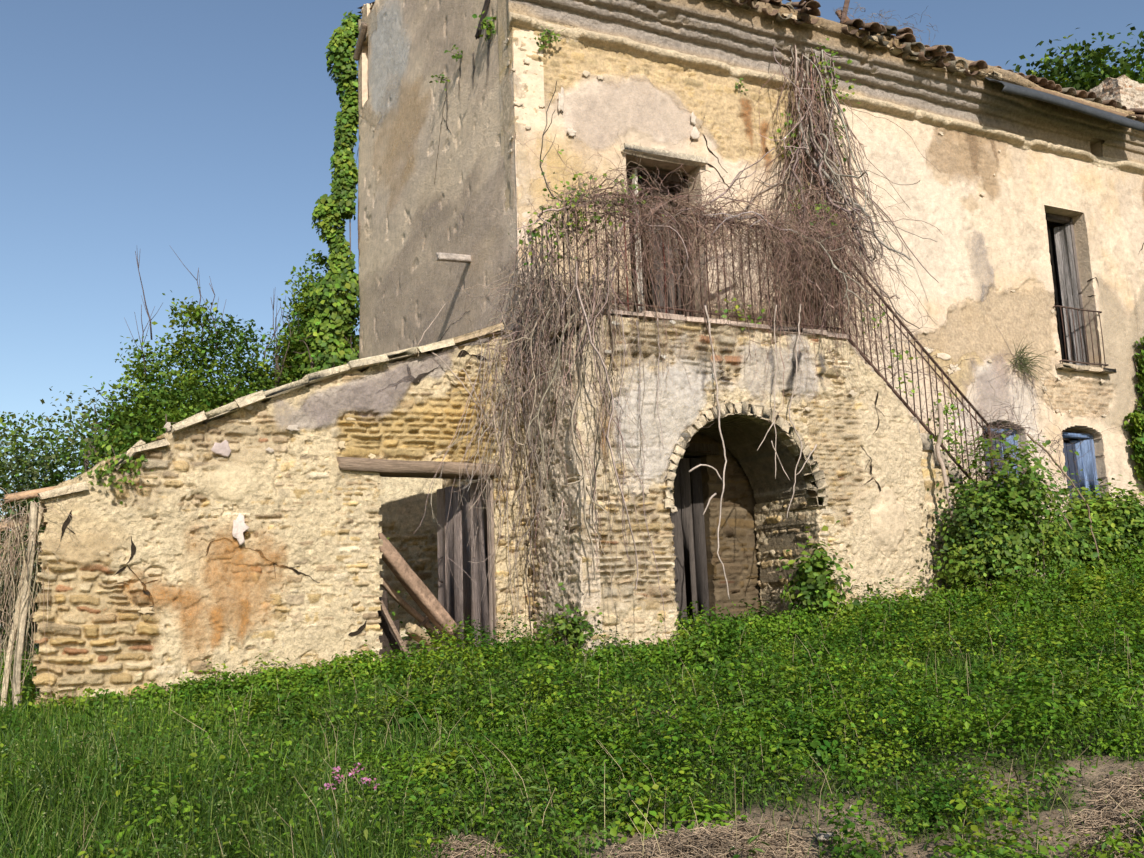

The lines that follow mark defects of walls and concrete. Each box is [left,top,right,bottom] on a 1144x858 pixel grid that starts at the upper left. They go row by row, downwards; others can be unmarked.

spalling [501,15,806,207]
spalling [338,372,495,463]
flaking render [913,286,1114,417]
spalling [32,534,157,708]